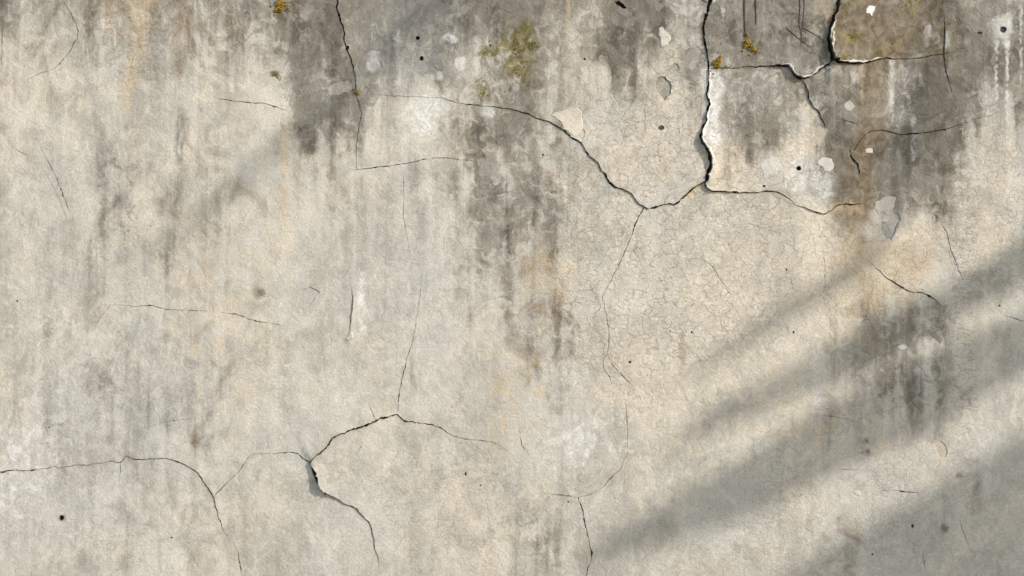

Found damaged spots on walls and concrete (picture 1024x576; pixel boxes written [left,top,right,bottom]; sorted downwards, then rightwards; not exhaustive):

crack [1,284,491,522]
crack [336,0,471,239]
peeling [551,107,585,141]
leakage [249,0,1024,576]
crack [387,0,992,575]
flaking render [701,0,896,201]
spalling [874,196,901,240]